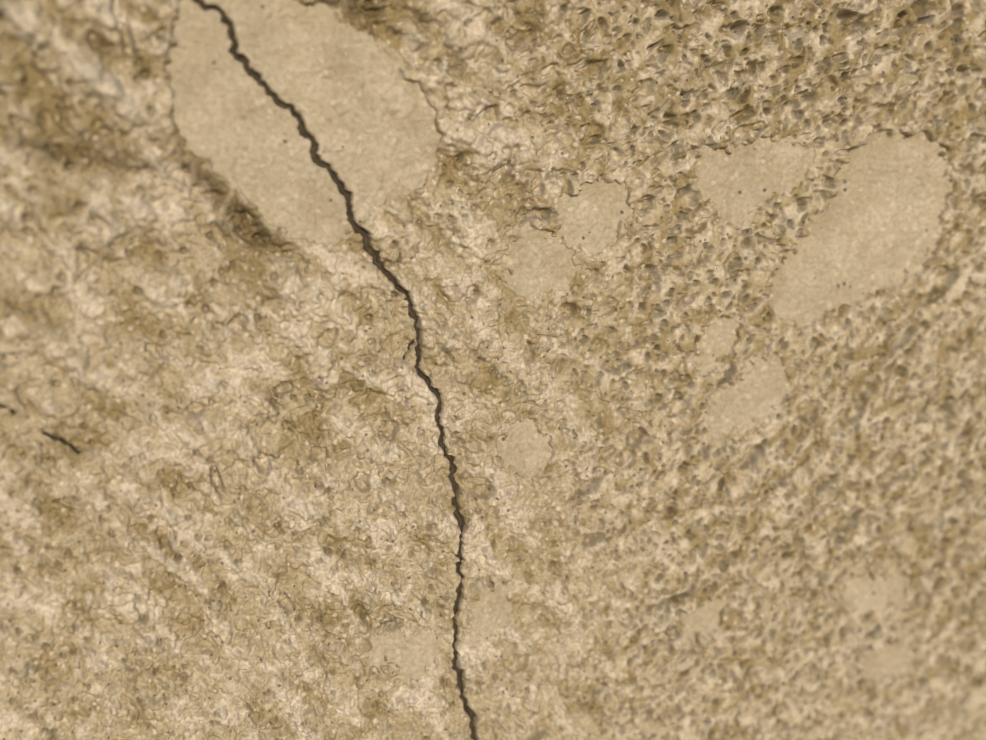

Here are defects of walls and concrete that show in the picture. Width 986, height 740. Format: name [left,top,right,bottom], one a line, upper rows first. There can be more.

spalling [165,0,442,248]
spalling [501,180,633,303]
spalling [691,136,815,230]
spalling [770,130,954,327]
crack [42,432,80,454]
crack [192,0,477,740]